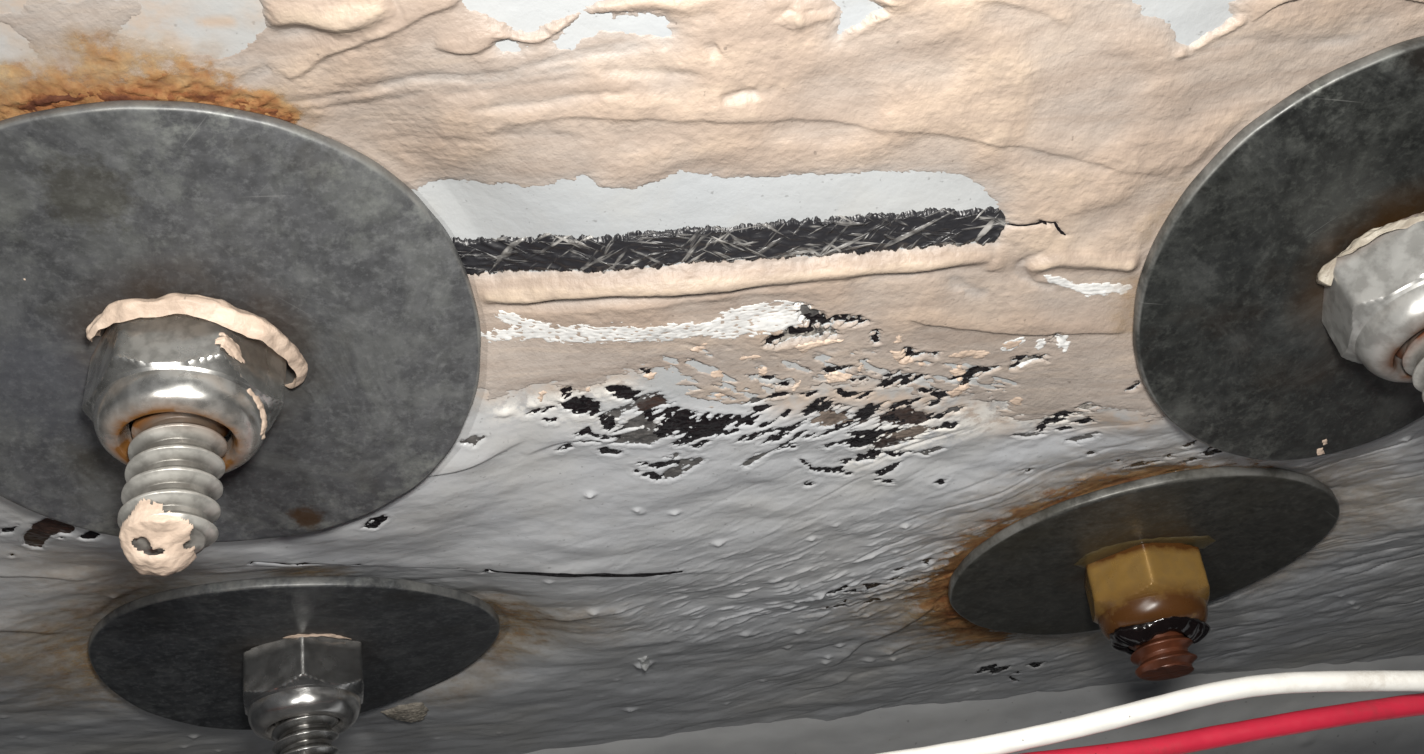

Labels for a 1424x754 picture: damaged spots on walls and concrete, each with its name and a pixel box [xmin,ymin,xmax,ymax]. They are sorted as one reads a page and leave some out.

rust [0,34,302,124]
peeling [1044,275,1133,297]
peeling [481,300,1070,485]
peeling [1013,402,1100,455]
peeling [1115,440,1223,468]
peeling [2,518,100,556]
crack [249,559,360,567]
crack [482,569,683,577]
peeling [825,558,933,608]
rust [904,462,1272,647]
peeling [974,661,1045,681]